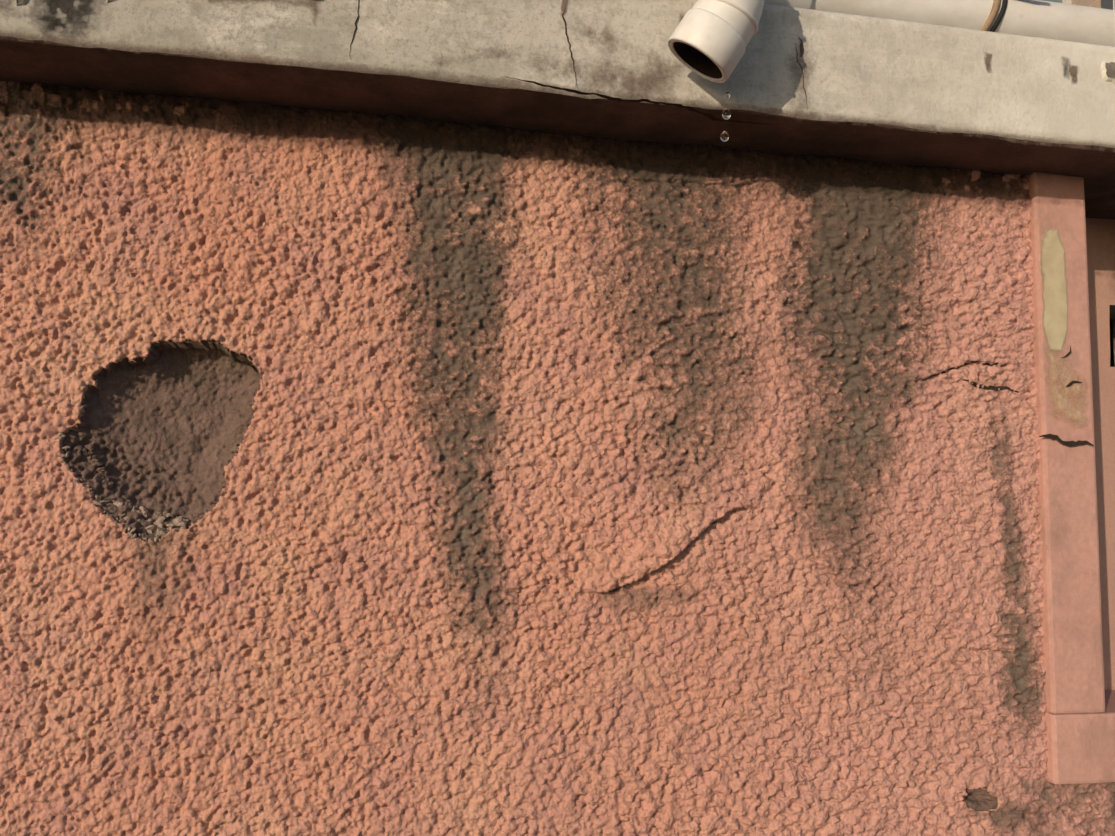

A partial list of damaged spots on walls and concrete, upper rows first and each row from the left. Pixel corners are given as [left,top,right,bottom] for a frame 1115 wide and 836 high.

crack [349,0,359,58]
water stain [592,64,667,93]
crack [508,0,778,125]
crack [795,37,807,104]
water stain [1064,63,1077,82]
water stain [0,81,1030,632]
spalling [54,340,263,547]
water stain [998,492,1045,726]